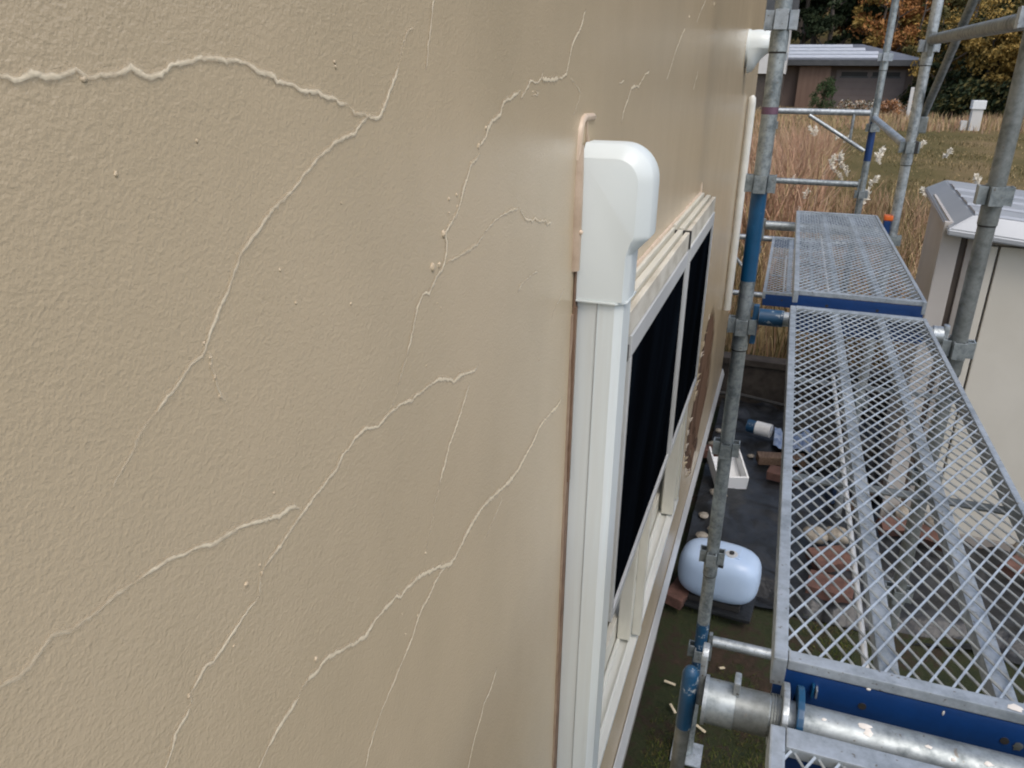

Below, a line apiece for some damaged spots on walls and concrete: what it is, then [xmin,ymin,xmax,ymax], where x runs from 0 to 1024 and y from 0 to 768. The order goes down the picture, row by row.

crack [0,55,399,412]
crack [4,368,477,768]
crack [259,398,562,768]
crack [403,11,586,368]
peeling [683,314,714,477]